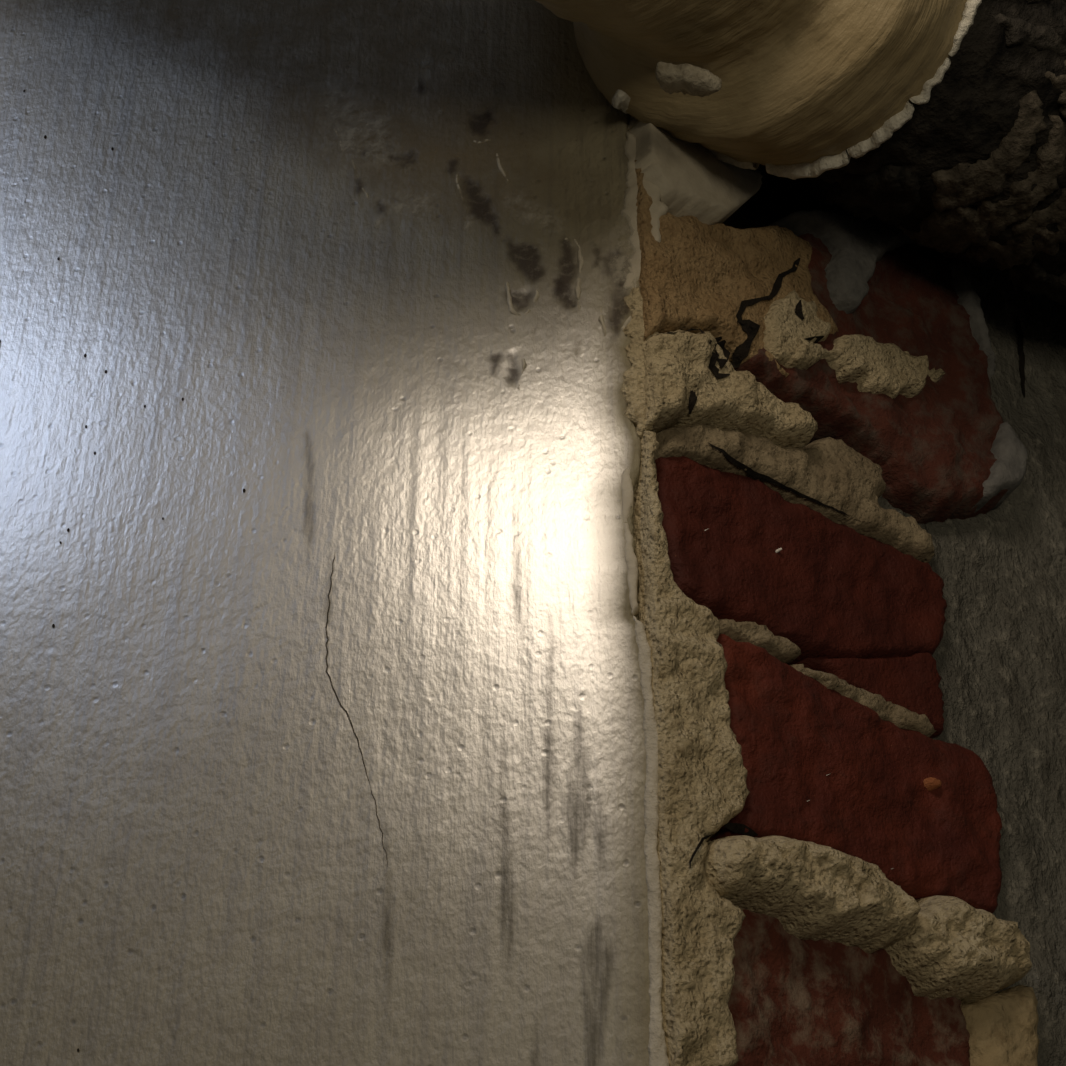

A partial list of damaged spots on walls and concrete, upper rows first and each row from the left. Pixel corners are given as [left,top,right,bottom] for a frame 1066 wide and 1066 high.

crack [662,258,824,379]
crack [689,390,698,414]
crack [708,443,850,517]
flaking render [598,0,982,1066]
crack [325,554,388,865]